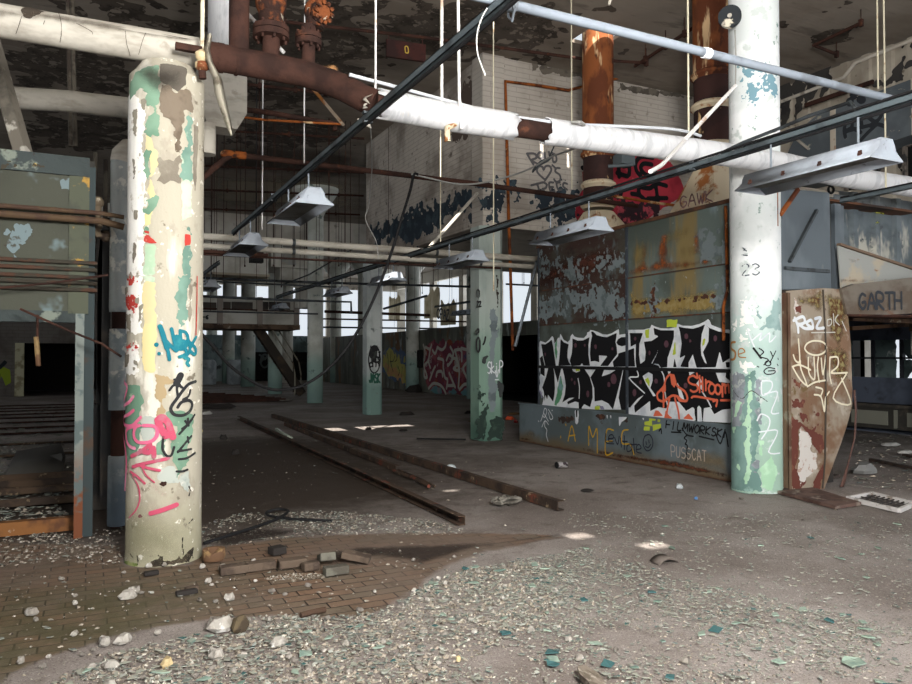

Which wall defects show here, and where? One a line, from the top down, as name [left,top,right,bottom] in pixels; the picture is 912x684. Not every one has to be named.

peeling [48,0,208,37]
peeling [315,0,488,88]
peeling [446,2,582,78]
peeling [221,77,356,151]
peeling [737,62,832,126]
peeling [370,175,580,248]
peeling [4,41,199,492]
rust [544,252,618,282]
rust [636,236,689,272]
rust [631,283,716,317]
peeling [731,361,778,494]
peeling [791,399,824,489]